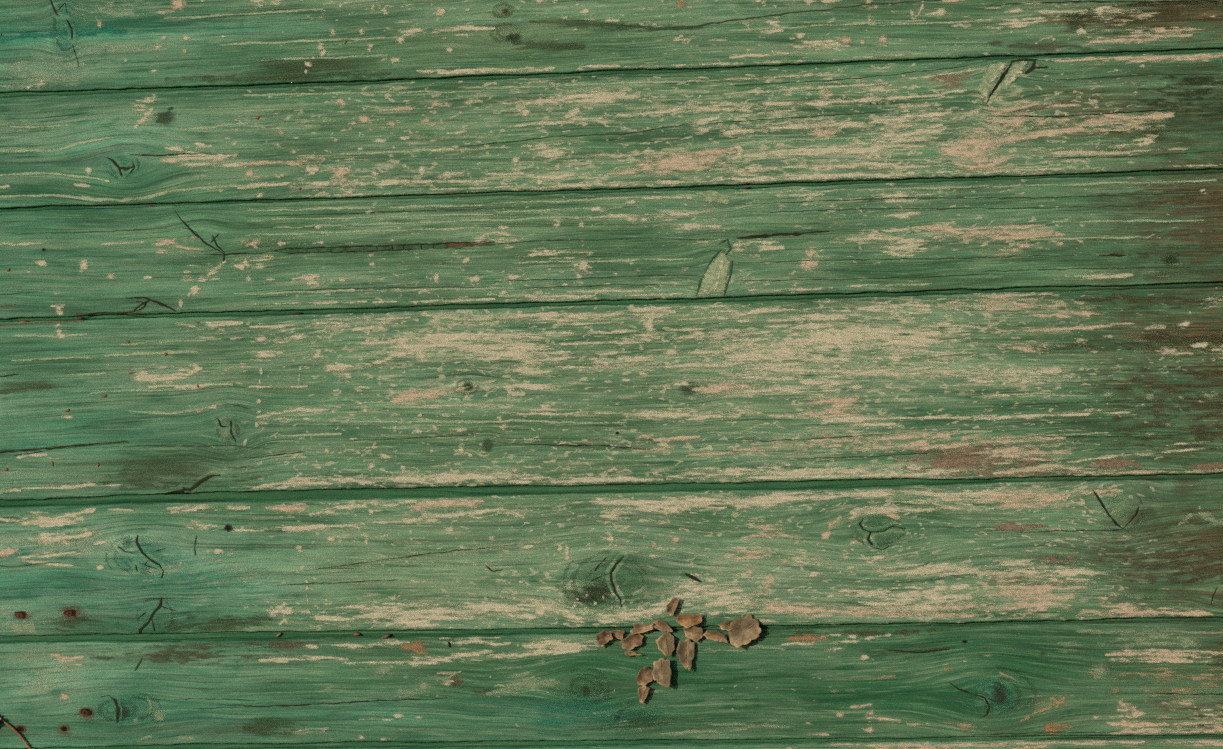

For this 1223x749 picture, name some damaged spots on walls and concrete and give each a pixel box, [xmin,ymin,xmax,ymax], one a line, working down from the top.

peeling [1,36,166,89]
peeling [75,3,136,27]
peeling [157,0,495,73]
peeling [581,0,1223,68]
crack [12,192,1203,295]
peeling [0,61,1223,494]
peeling [0,508,134,570]
peeling [167,504,250,530]
crack [118,535,176,671]
crack [591,556,624,607]
peeling [50,654,84,699]
crack [101,695,119,722]